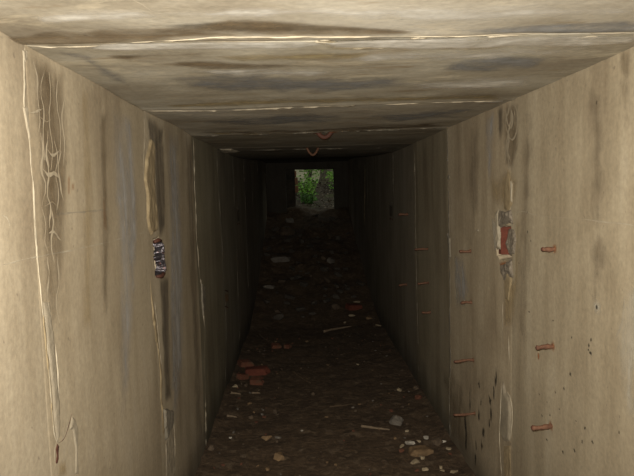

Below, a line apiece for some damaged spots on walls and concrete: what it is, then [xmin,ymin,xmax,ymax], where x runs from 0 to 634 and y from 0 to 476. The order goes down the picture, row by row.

crack [30,62,108,322]
spalling [494,209,517,301]